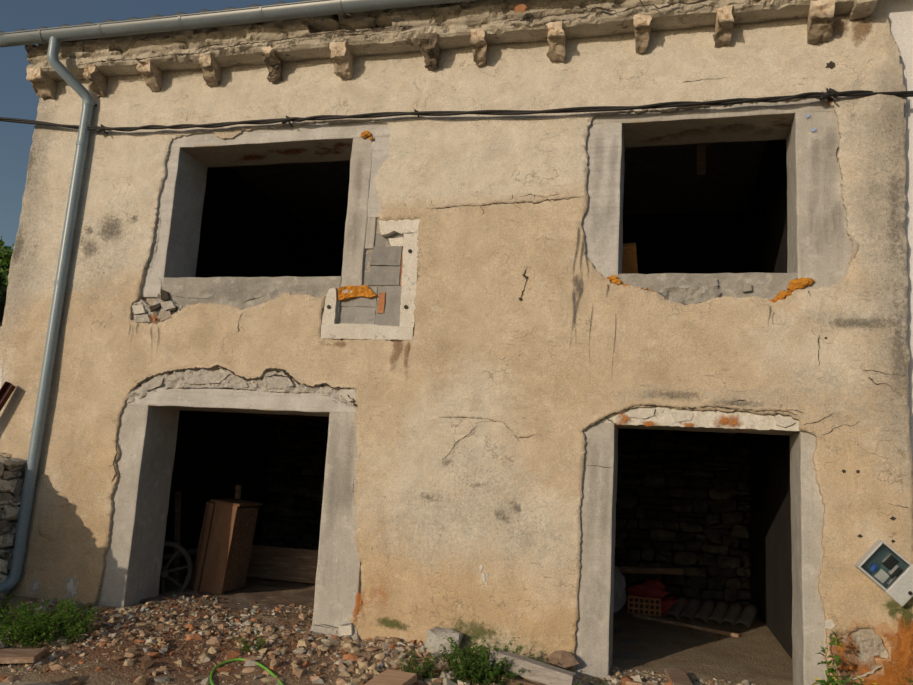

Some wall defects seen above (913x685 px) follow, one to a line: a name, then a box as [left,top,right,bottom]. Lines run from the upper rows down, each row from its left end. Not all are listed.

crack [424,188,585,213]
damp [572,229,589,329]
spalling [658,278,722,305]
spalling [126,368,356,408]
crack [438,410,536,461]
flaking render [615,407,799,431]
crack [579,398,860,435]
corrosion [714,416,739,426]
spalling [824,619,889,685]
corrosion [825,617,913,685]